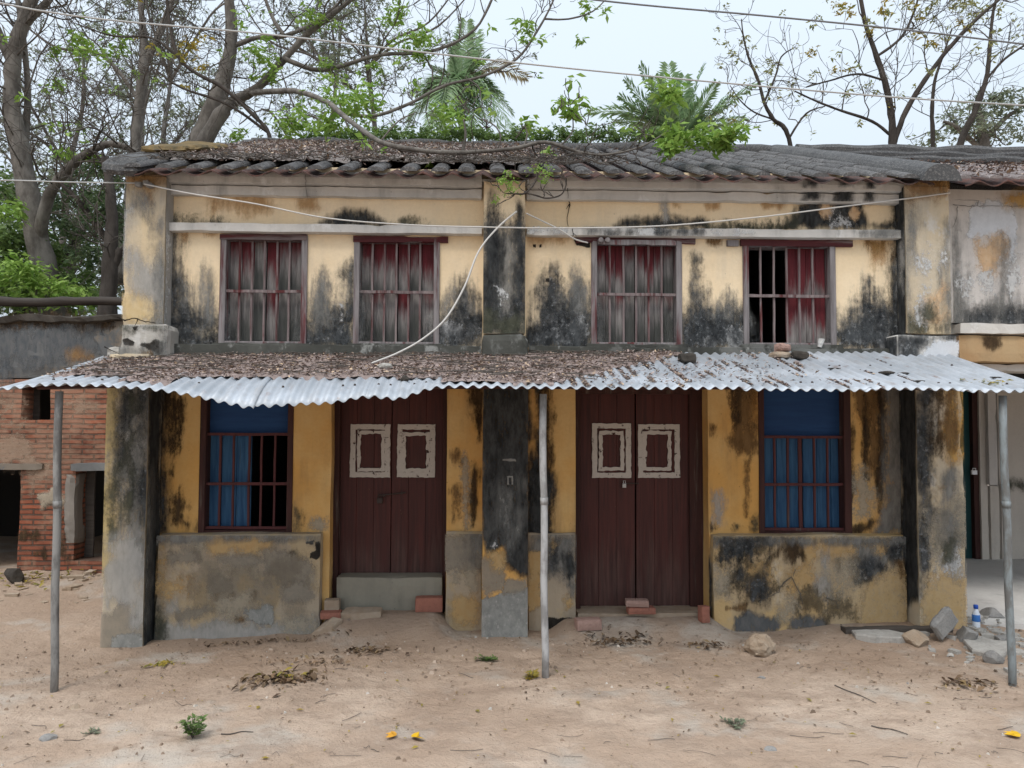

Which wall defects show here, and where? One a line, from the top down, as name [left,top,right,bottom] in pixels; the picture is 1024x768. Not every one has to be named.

leakage [0,178,230,382]
leakage [306,264,363,345]
leakage [427,192,591,346]
leakage [587,176,1024,357]
peeling [954,193,1024,306]
leakage [103,388,319,646]
leakage [451,389,576,612]
leakage [709,389,962,632]